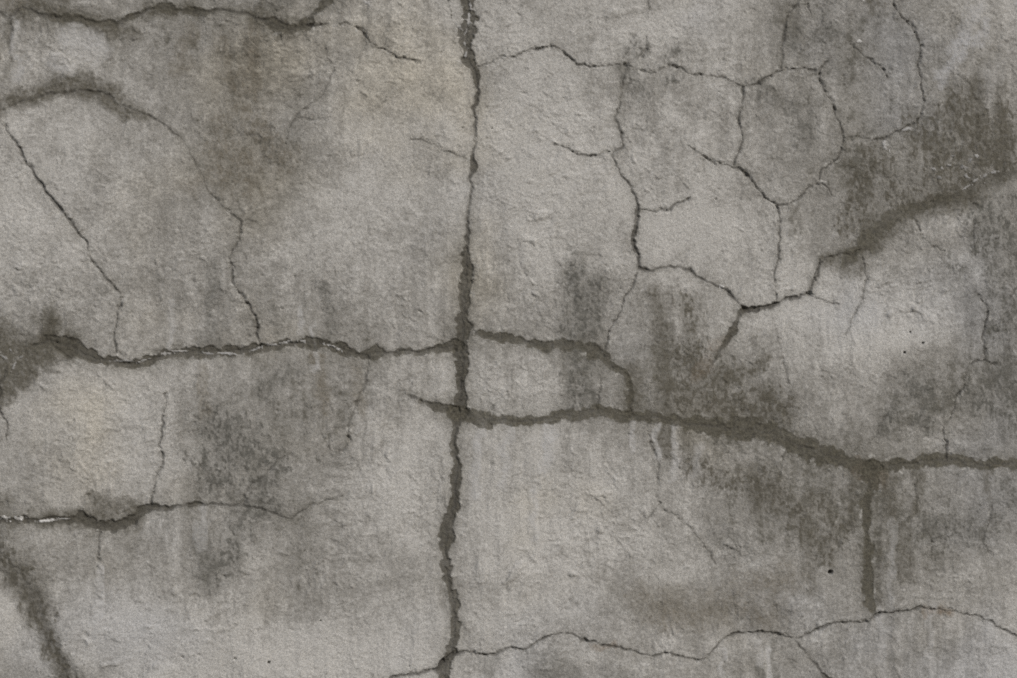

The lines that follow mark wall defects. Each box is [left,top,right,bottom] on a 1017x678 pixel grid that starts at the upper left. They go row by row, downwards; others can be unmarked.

leakage [0,292,87,411]
leakage [0,488,150,677]
crack [0,392,345,678]
crack [0,0,927,454]
crack [388,100,1017,678]
leakage [619,280,860,678]
leakage [817,0,1017,444]
leakage [873,468,1017,678]